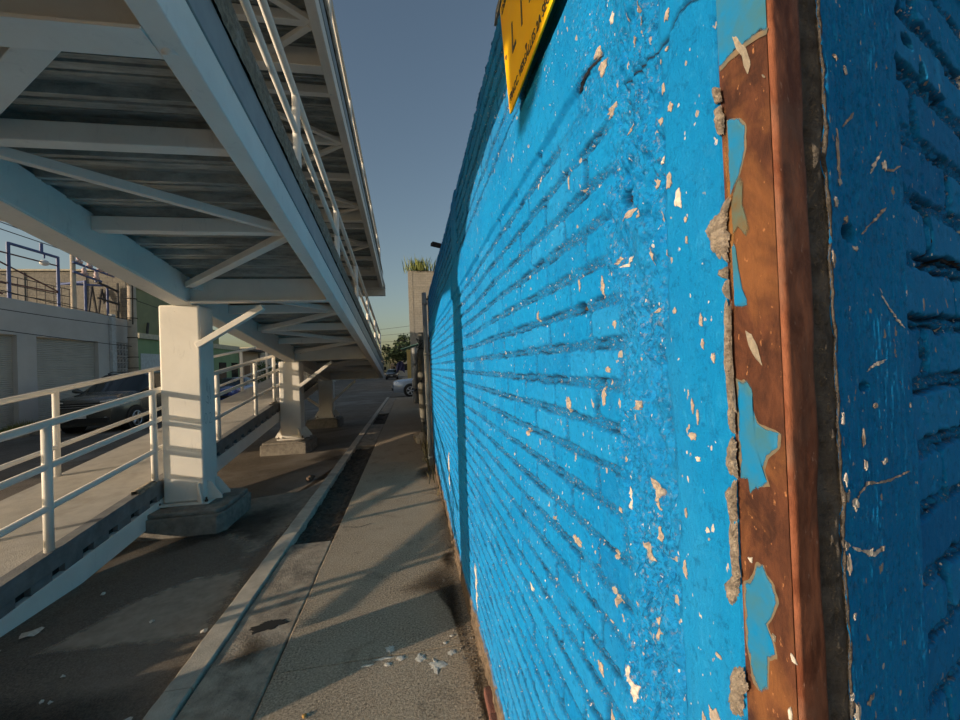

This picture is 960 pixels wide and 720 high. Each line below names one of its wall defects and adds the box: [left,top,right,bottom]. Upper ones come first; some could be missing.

crack [580,54,604,92]
crack [627,0,694,83]
peeling [716,0,767,66]
peeling [655,156,687,223]
corrosion [726,156,734,284]
spalling [798,0,875,720]
peeling [700,87,779,720]
water stain [227,466,335,558]
water stain [36,570,247,654]
water stain [419,554,463,642]
water stain [474,663,489,720]
peeling [625,666,641,703]